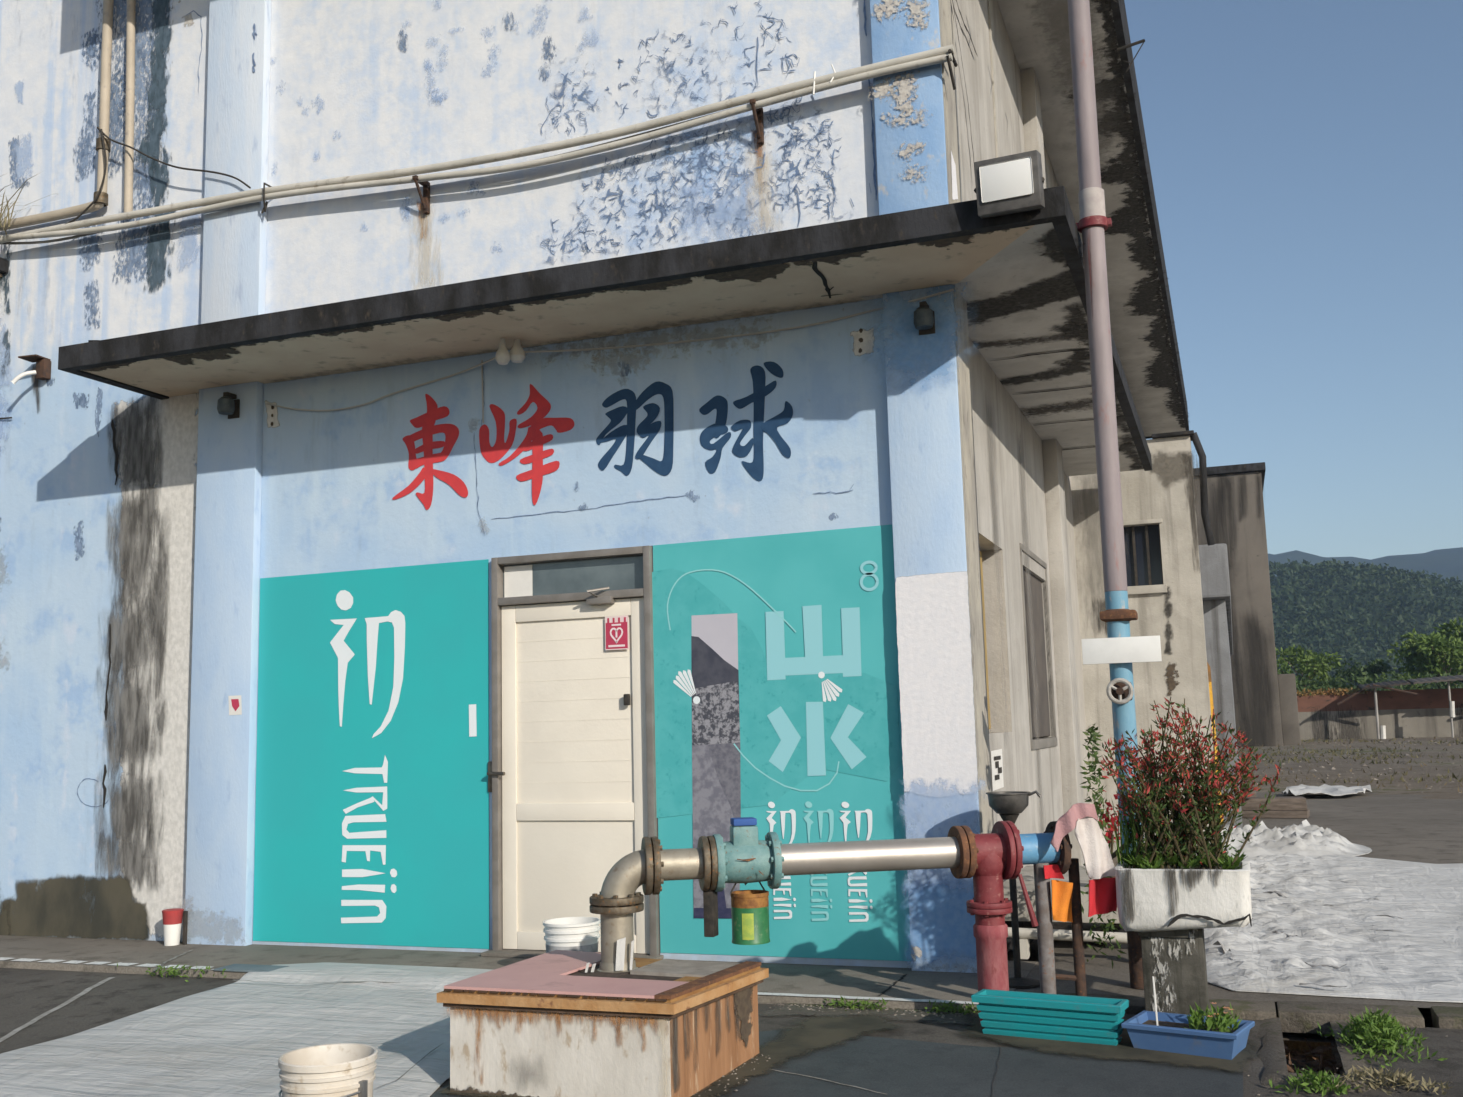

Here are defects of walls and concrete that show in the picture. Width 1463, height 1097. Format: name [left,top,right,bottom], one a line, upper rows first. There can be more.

water stain [135,0,176,293]
rust [417,202,426,239]
peeling [538,38,599,119]
peeling [547,105,834,261]
crack [541,0,877,255]
rust [753,131,763,187]
crack [812,262,841,298]
peeling [868,71,933,182]
water stain [882,230,1090,386]
water stain [1091,0,1189,428]
water stain [0,397,167,941]
rust [448,987,753,1091]